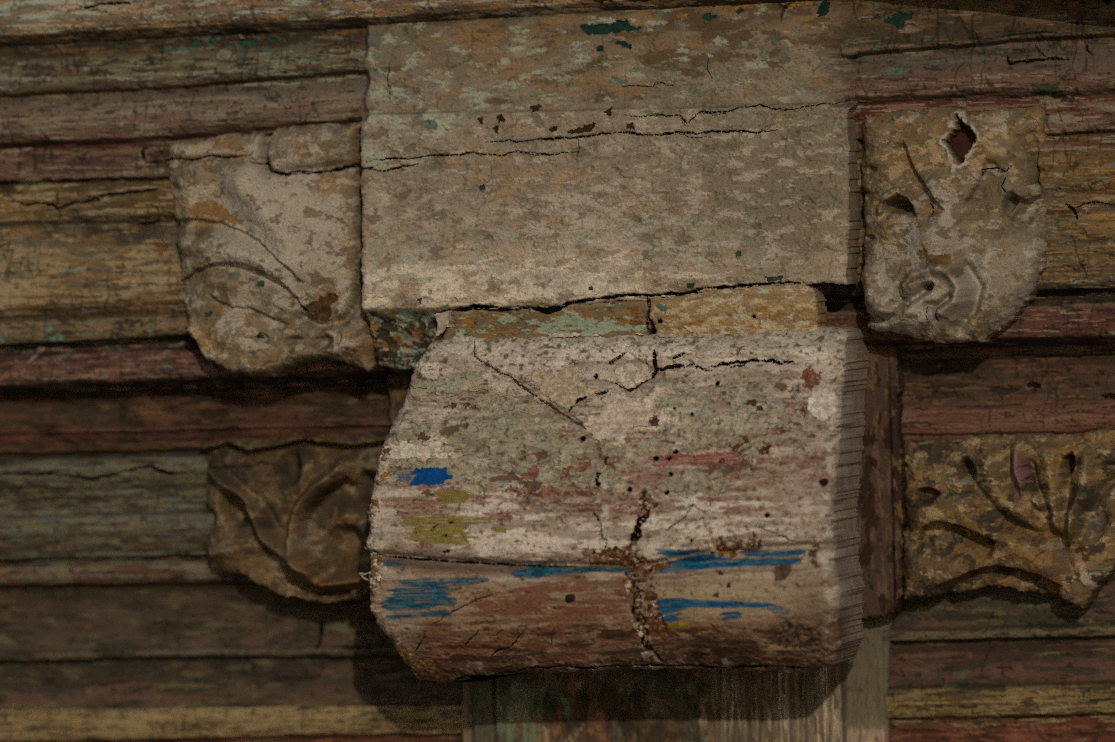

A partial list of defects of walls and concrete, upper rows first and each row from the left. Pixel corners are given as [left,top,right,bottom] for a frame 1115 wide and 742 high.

peeling [580,19,641,52]
peeling [477,114,506,133]
peeling [549,107,613,134]
crack [11,99,850,226]
crack [1026,281,1115,308]
crack [453,281,867,430]
peeling [799,368,841,421]
peeling [384,430,434,462]
peeling [524,362,794,497]
crack [377,553,577,567]
crack [455,458,809,682]
crack [415,592,500,651]